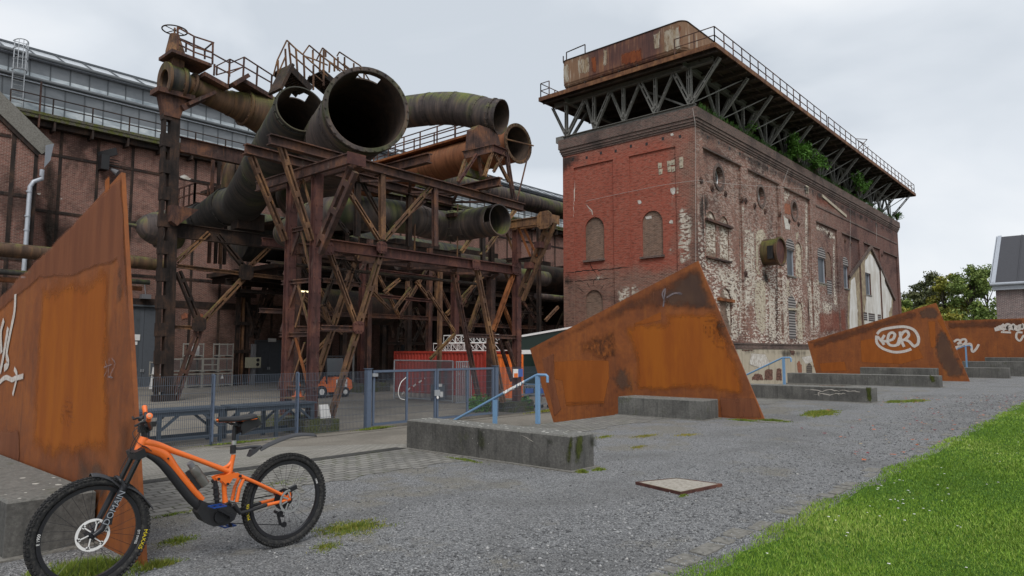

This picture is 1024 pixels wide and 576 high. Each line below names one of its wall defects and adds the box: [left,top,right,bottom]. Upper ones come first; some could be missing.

corrosion [0,177,126,453]
corrosion [542,272,761,418]
peeling [670,209,691,263]
peeling [705,190,837,373]
corrosion [814,308,1021,377]
corrosion [0,430,19,461]